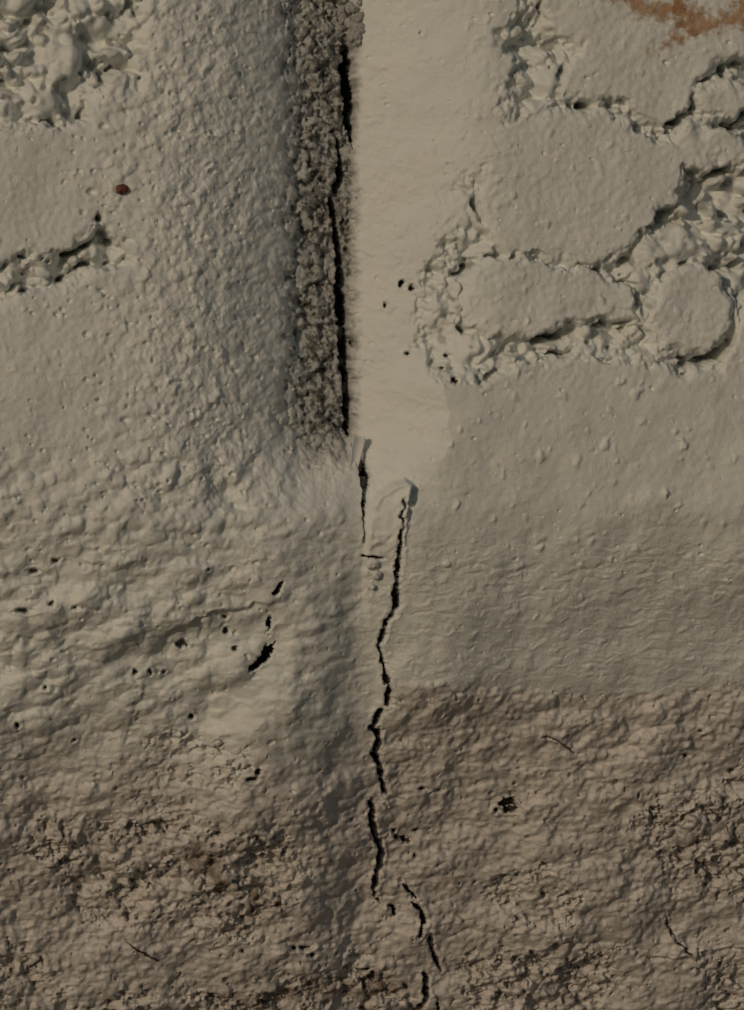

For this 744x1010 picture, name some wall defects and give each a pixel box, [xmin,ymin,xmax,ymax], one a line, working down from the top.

spalling [0,0,146,132]
spalling [494,0,744,141]
rust [612,0,744,45]
spalling [0,215,127,299]
crack [327,49,353,435]
spalling [398,165,744,385]
crack [358,457,440,1010]